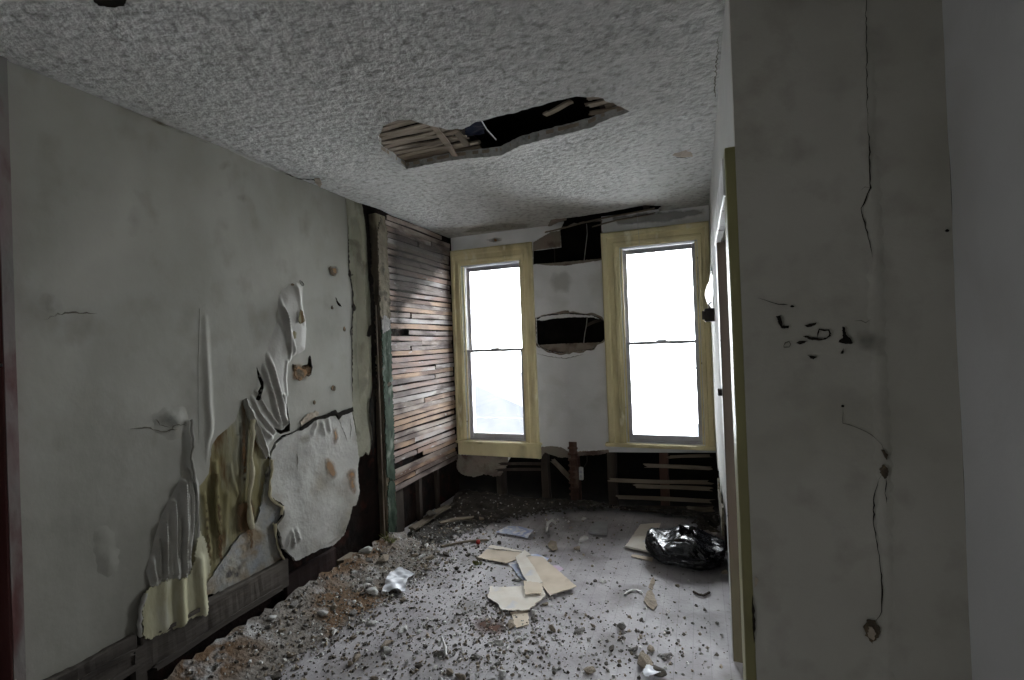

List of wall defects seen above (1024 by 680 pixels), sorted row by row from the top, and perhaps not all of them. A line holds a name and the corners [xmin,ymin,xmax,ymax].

crack [861,0,872,252]
spalling [533,218,603,266]
crack [49,310,96,318]
spalling [535,310,605,355]
peeling [776,305,853,359]
spalling [292,356,313,381]
flaking render [269,400,360,561]
spalling [456,454,509,477]
crack [873,475,887,619]